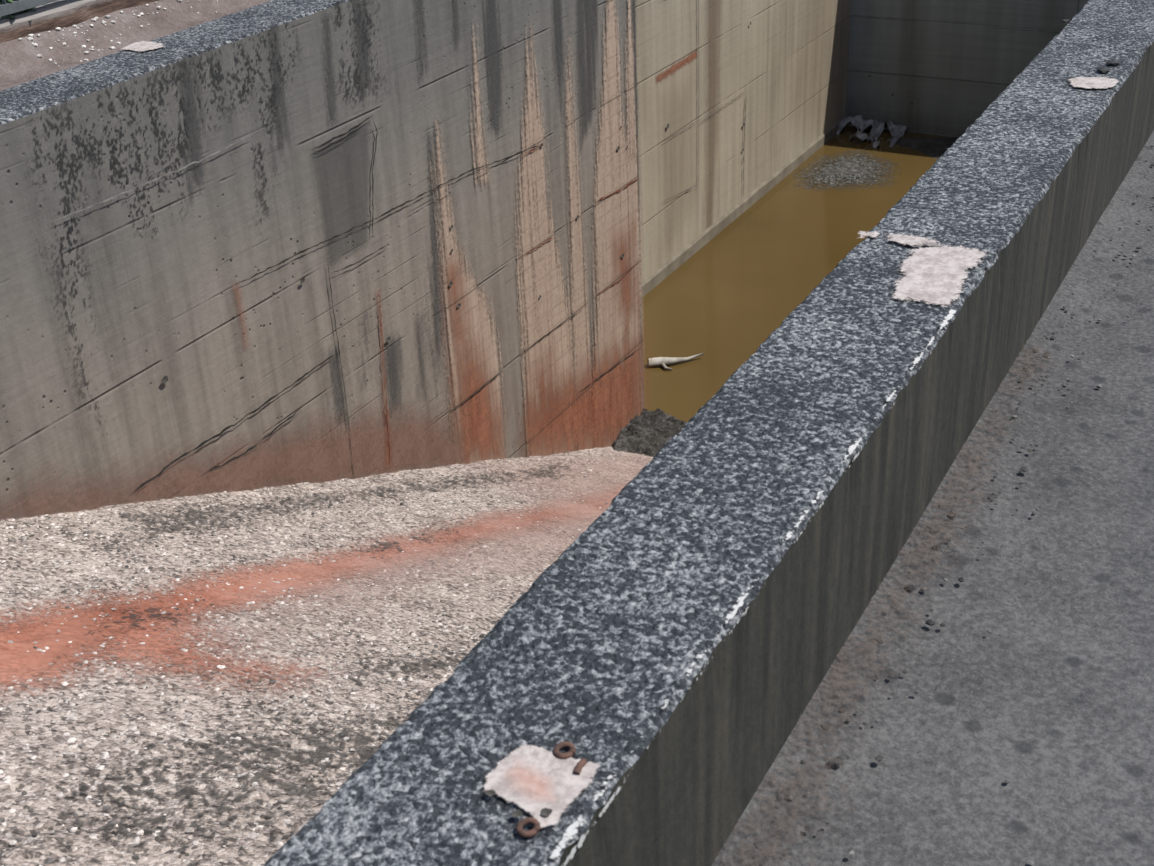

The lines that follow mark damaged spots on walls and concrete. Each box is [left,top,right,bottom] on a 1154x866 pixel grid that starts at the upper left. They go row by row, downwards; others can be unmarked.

damp [471,0,501,185]
spalling [1069,77,1119,89]
crack [51,134,253,222]
damp [31,24,297,409]
crack [131,115,543,494]
damp [430,125,505,464]
damp [515,0,644,457]
crack [523,261,640,352]
spalling [858,231,987,370]
rust [526,343,642,455]
spalling [725,578,759,634]
spalling [484,741,625,866]